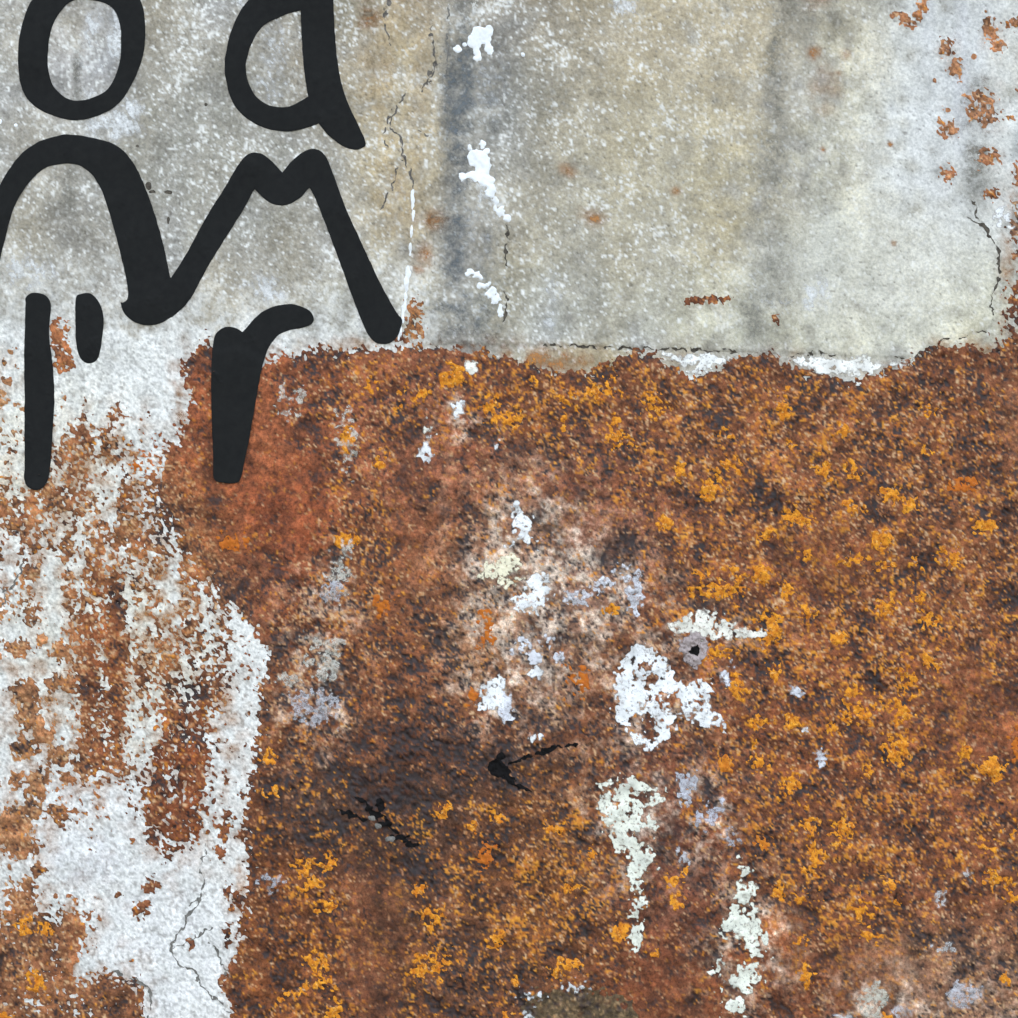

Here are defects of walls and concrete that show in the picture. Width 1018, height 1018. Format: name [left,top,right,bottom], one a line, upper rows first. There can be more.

corrosion [889,0,929,30]
corrosion [978,10,1018,59]
crack [380,0,451,210]
corrosion [936,108,959,140]
corrosion [933,36,1016,129]
corrosion [974,147,1003,171]
corrosion [983,187,1001,203]
corrosion [1004,160,1018,260]
crack [895,198,1002,361]
crack [543,343,751,355]
crack [790,350,837,358]
corrosion [0,269,1018,1018]